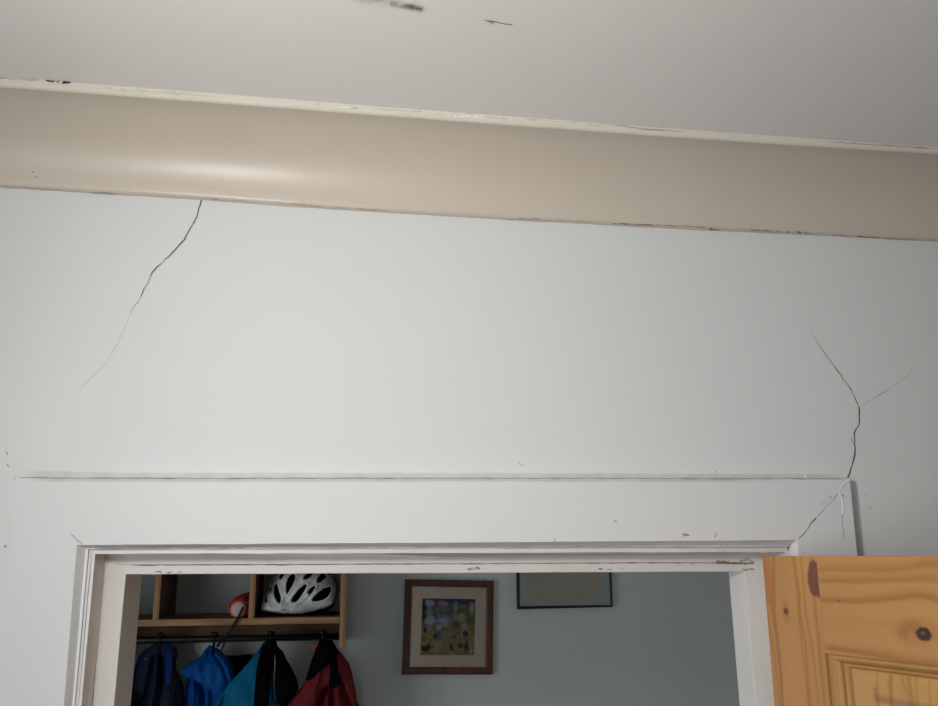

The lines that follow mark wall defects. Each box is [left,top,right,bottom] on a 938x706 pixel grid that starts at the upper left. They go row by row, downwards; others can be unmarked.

crack [133,199,218,308]